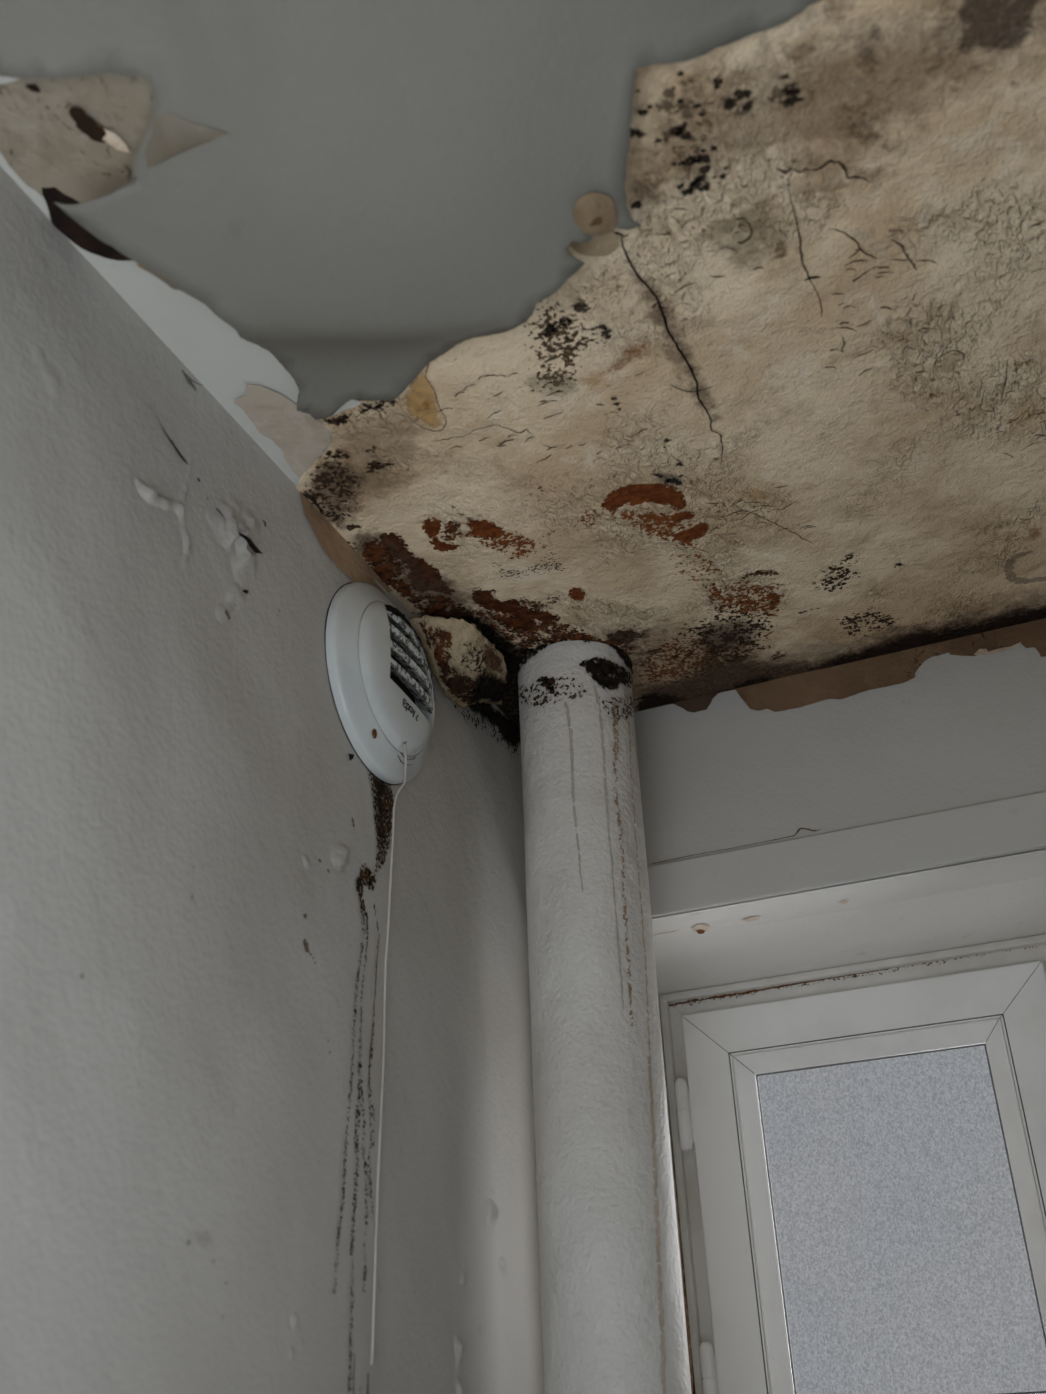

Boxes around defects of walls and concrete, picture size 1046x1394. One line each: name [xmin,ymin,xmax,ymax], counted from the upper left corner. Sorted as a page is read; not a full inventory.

leakage [959,0,1037,50]
leakage [630,71,804,197]
leakage [303,447,394,528]
leakage [324,376,438,426]
spalling [0,0,1046,713]
leakage [523,298,612,394]
leakage [652,439,683,485]
crack [614,232,723,462]
corrosion [346,483,788,686]
leakage [811,551,861,592]
leakage [420,600,1046,1026]
leakage [333,769,394,1394]